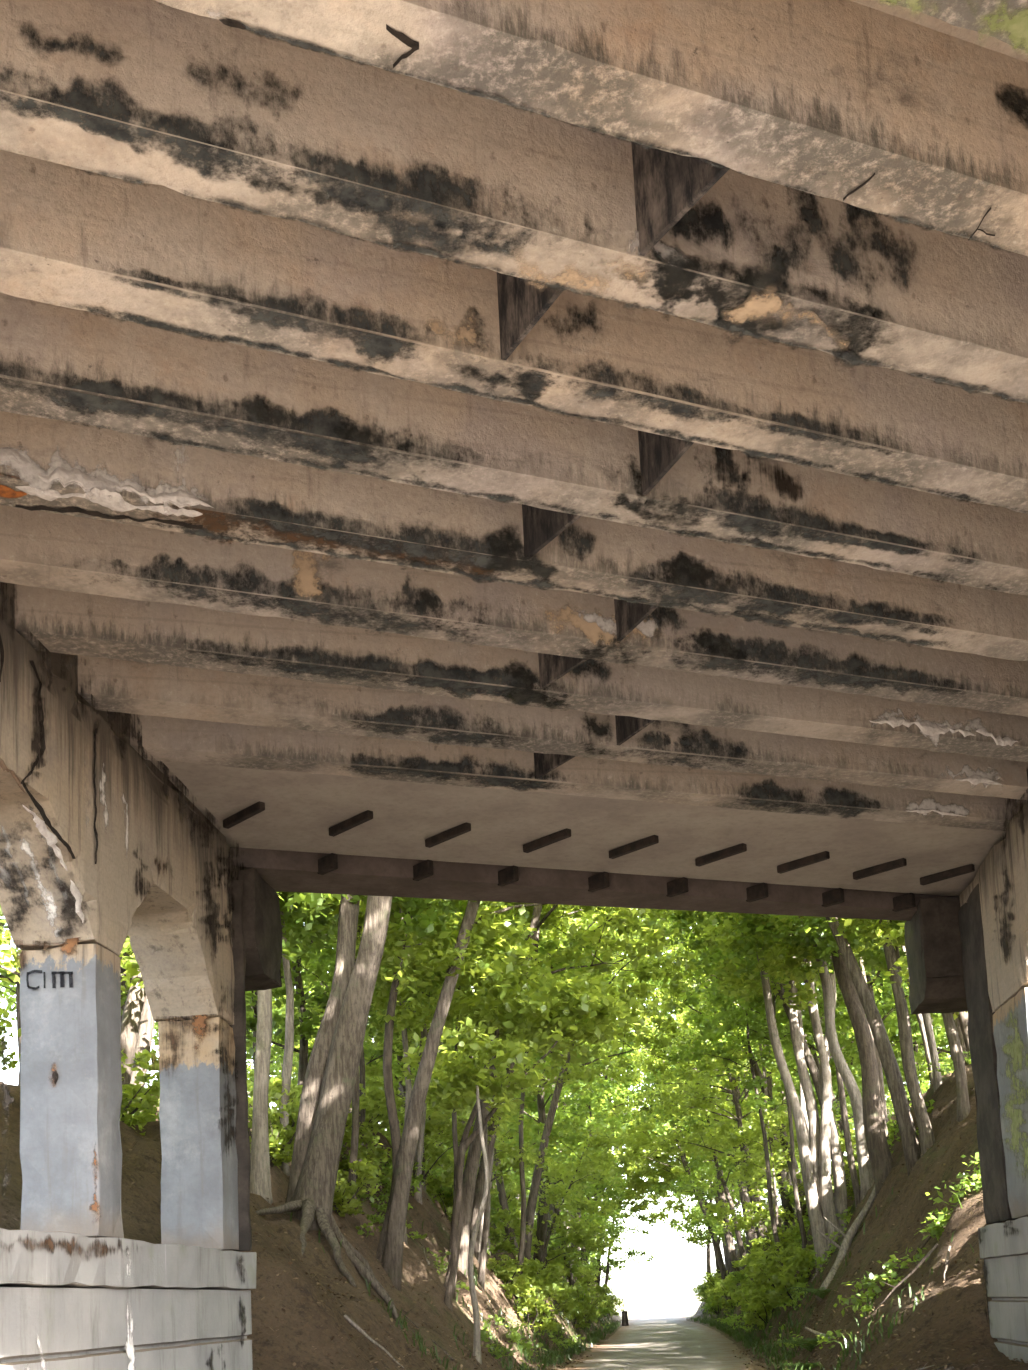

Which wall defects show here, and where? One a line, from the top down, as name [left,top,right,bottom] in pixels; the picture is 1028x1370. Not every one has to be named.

water stain [0,23,1028,402]
spalling [0,447,213,529]
water stain [0,358,523,503]
water stain [432,358,979,583]
water stain [112,498,964,791]
crack [0,635,98,864]
water stain [737,779,881,818]
spalling [907,798,969,817]
spalling [869,709,1018,746]